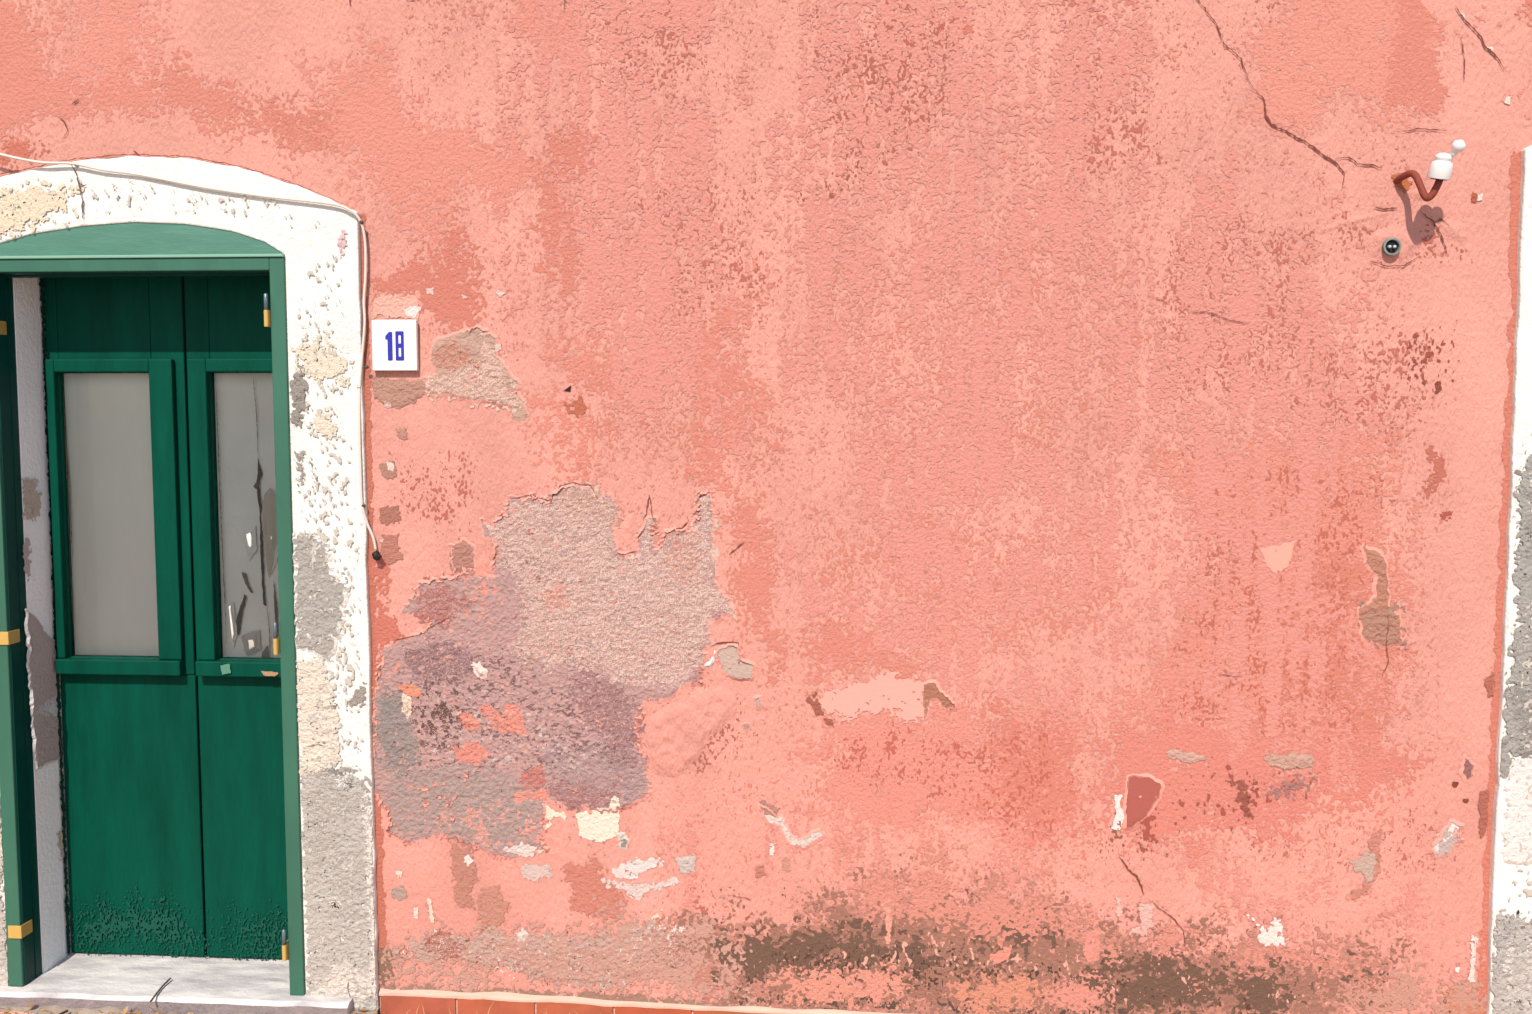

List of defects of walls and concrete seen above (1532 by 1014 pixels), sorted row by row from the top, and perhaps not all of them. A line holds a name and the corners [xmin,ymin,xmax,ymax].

crack [1198,0,1380,187]
crack [1371,207,1447,267]
peeling [289,0,1479,1011]
spalling [1452,454,1532,863]
peeling [1455,909,1532,1014]